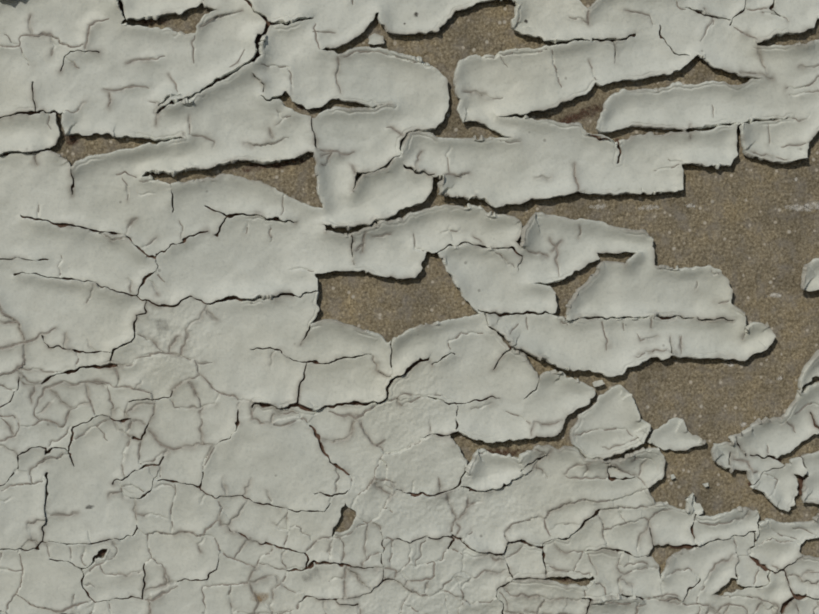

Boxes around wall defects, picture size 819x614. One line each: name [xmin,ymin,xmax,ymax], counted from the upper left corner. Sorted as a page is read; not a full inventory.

peeling [118,0,243,63]
peeling [199,49,245,93]
peeling [0,108,169,194]
peeling [116,153,326,239]
peeling [245,0,819,614]
crack [0,205,563,614]
crack [566,467,606,480]